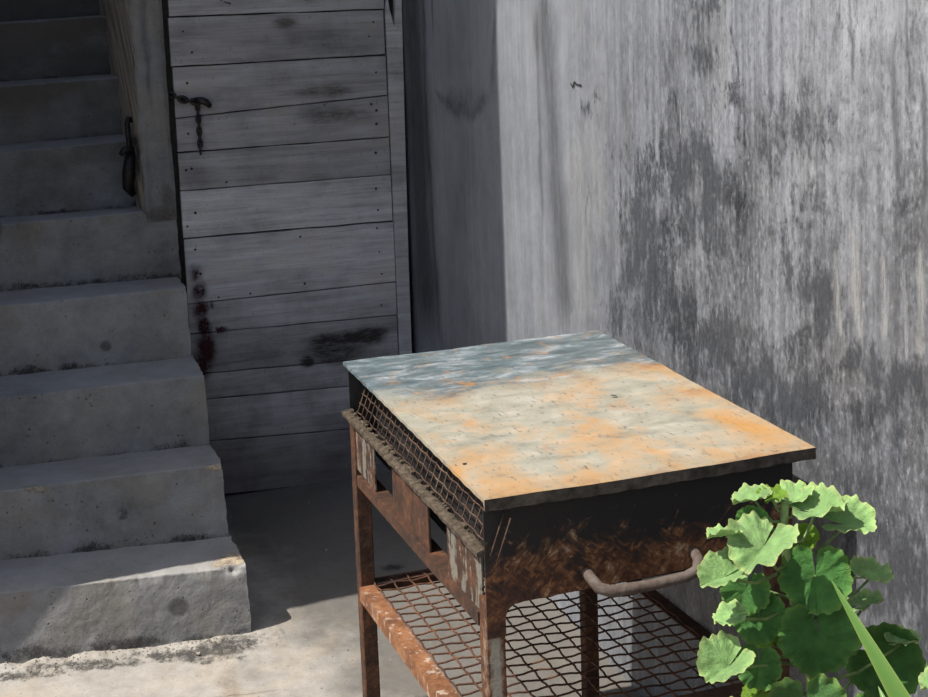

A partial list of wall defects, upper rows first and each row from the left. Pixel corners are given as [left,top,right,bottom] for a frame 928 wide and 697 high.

water stain [609,86,927,455]